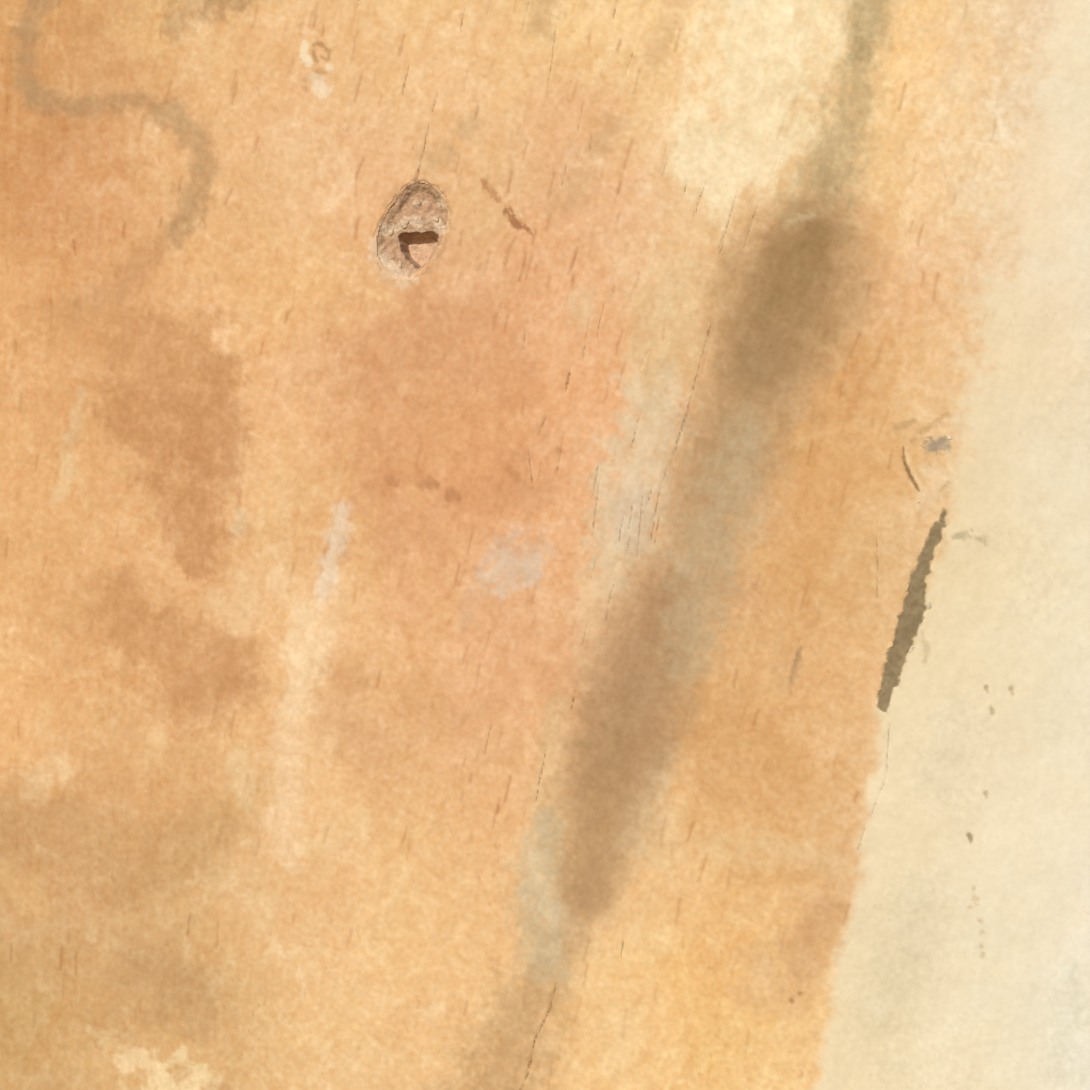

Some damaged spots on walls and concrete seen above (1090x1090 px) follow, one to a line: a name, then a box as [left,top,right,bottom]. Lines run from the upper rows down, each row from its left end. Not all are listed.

water stain [43,0,152,93]
water stain [919,0,1028,109]
spalling [365,177,452,294]
water stain [293,0,912,1090]
water stain [906,677,998,830]
water stain [720,849,965,1090]